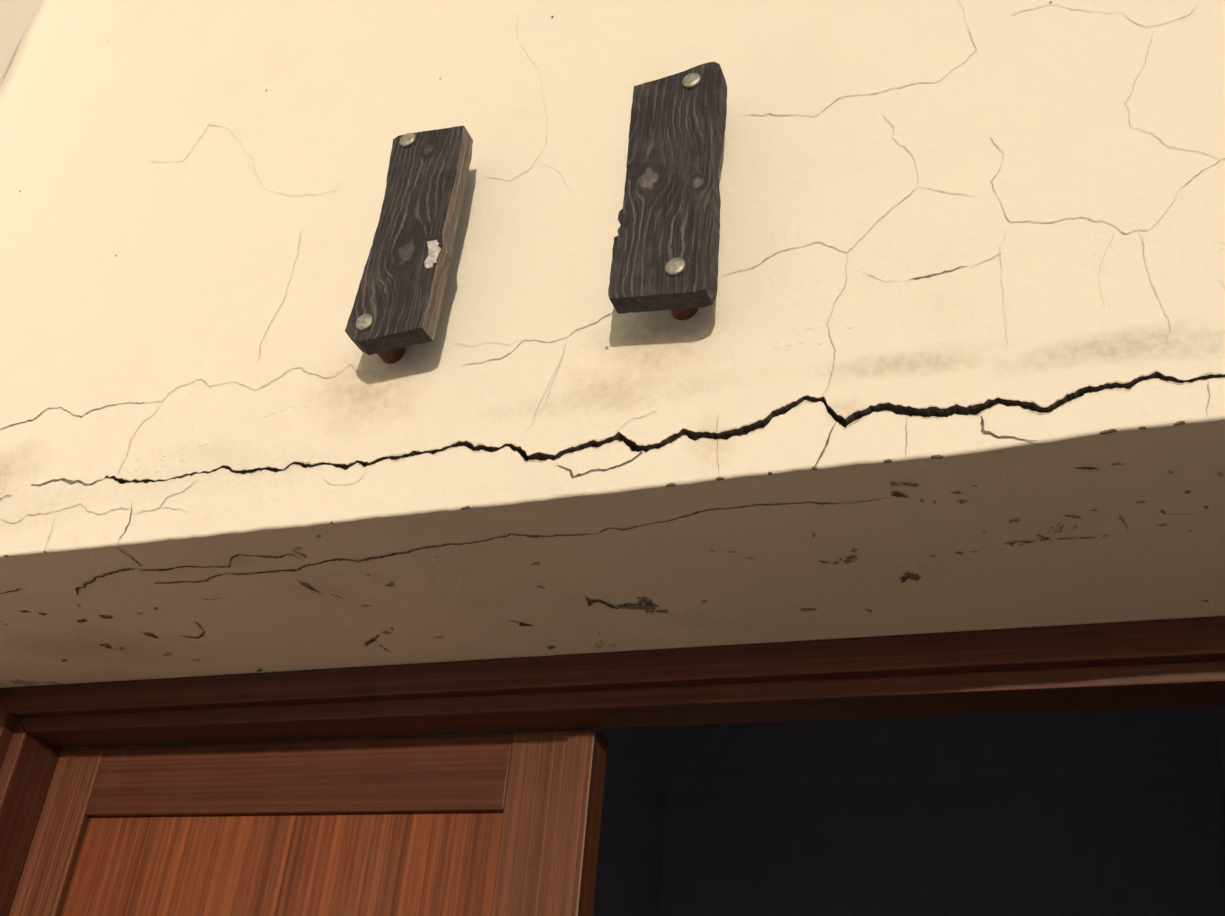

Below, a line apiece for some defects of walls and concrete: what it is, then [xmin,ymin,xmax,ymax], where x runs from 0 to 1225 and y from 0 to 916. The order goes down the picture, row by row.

crack [0,2,1225,639]
spalling [889,481,936,503]
spalling [1004,509,1109,547]
spalling [898,572,922,583]
spalling [585,596,668,614]